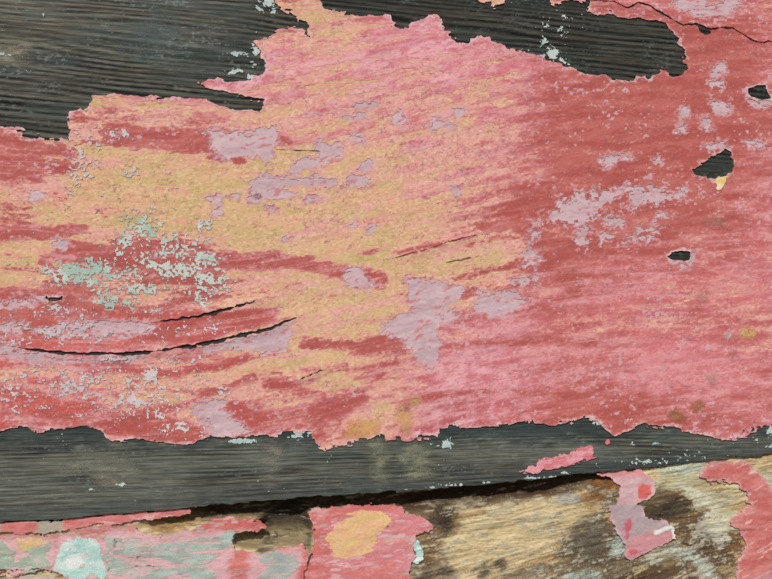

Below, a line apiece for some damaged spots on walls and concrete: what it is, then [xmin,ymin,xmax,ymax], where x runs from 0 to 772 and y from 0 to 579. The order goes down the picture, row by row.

crack [585,0,770,43]
peeling [702,61,731,132]
peeling [746,85,772,108]
peeling [674,106,691,135]
peeling [692,141,734,190]
peeling [667,251,695,268]
crack [160,300,255,322]
crack [19,317,296,356]
peeling [159,421,192,436]